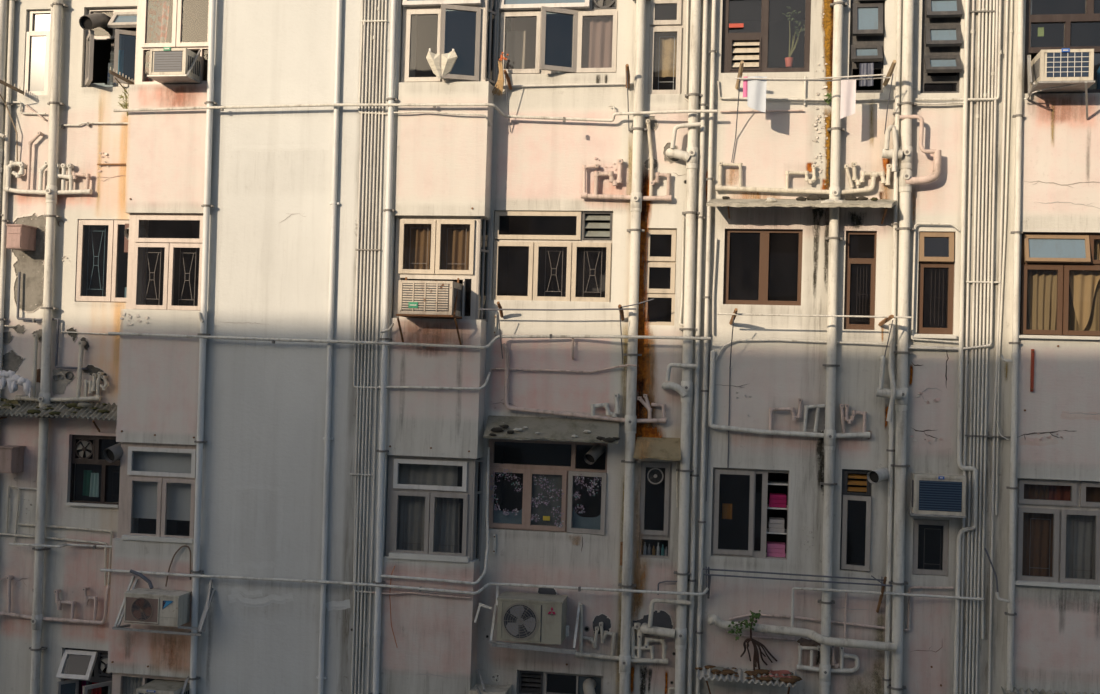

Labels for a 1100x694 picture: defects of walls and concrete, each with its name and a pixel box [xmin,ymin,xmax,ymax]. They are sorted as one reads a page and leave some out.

corrosion [822,0,834,93]
corrosion [822,112,832,190]
spalling [2,212,46,372]
corrosion [635,174,662,445]
spalling [36,327,109,395]